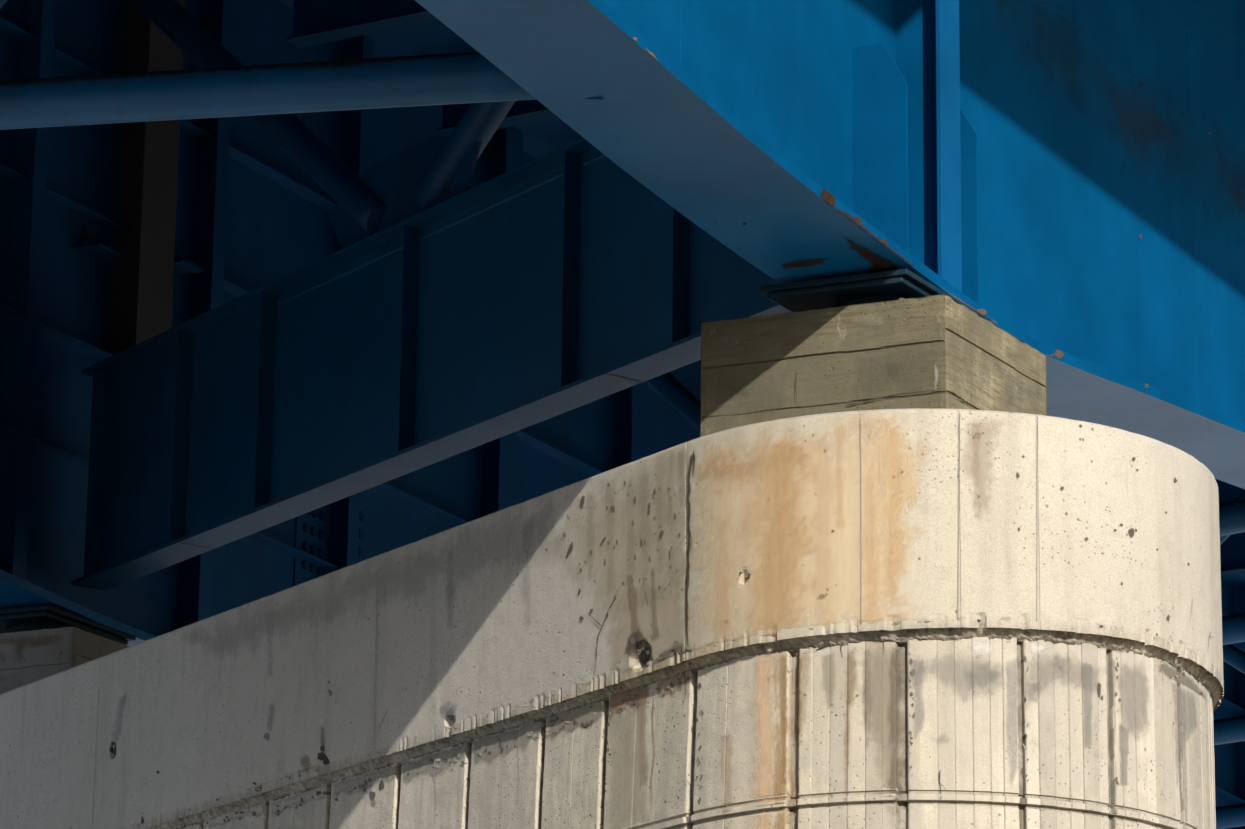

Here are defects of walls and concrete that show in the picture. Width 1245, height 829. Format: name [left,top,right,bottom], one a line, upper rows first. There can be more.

rust [783,259,824,268]
rust [821,189,912,273]
rust [700,435,885,625]